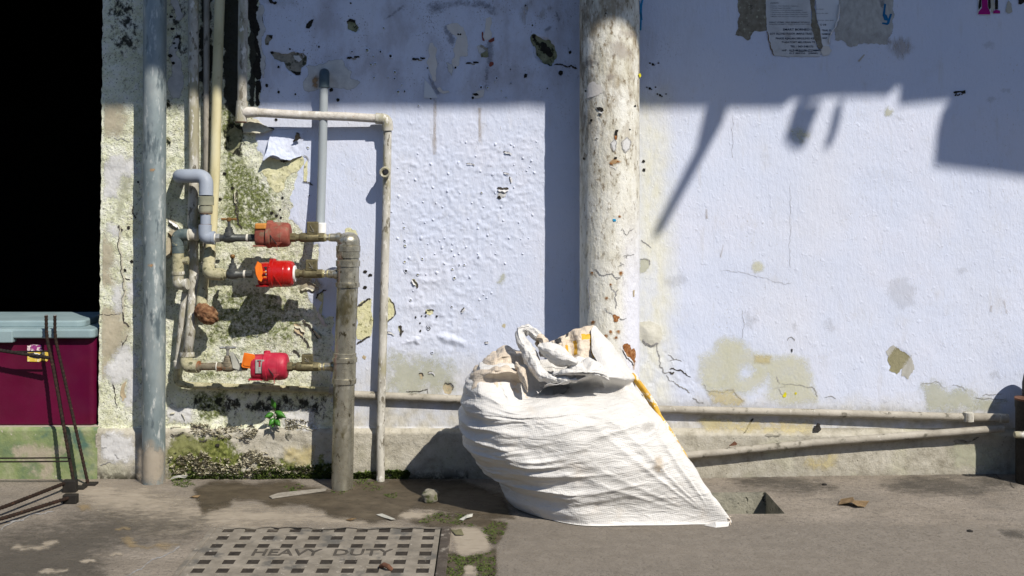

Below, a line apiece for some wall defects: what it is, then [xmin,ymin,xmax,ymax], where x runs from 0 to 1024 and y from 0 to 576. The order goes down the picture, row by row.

spalling [256,0,307,94]
spalling [530,24,571,75]
peeling [243,118,312,193]
spalling [356,270,373,359]
spalling [388,297,404,337]
crack [656,345,754,433]
peeling [886,345,914,379]
leakage [285,431,313,465]